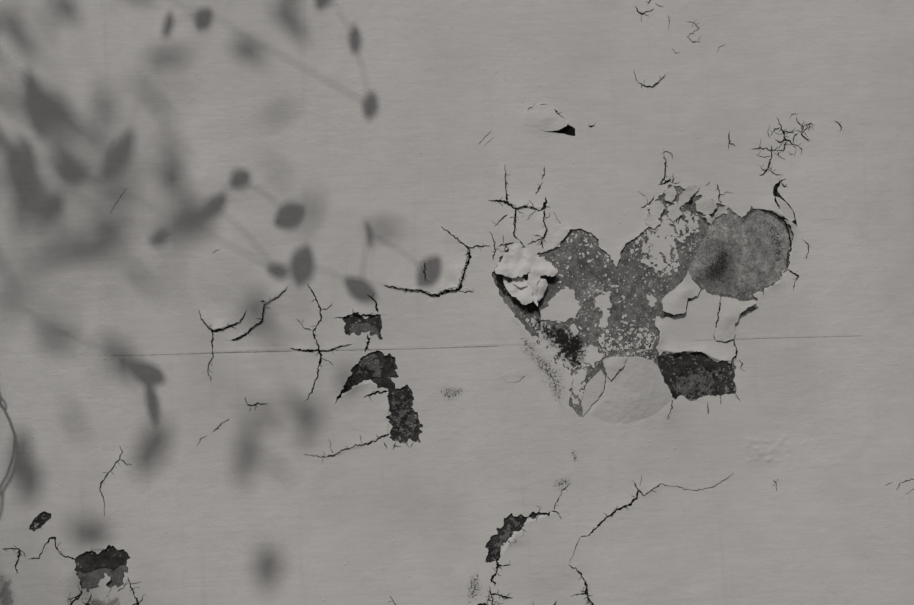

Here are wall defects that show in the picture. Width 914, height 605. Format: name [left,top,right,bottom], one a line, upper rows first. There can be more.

crack [728,113,842,176]
crack [385,167,560,297]
crack [114,285,385,400]
spalling [305,294,423,461]
peeling [492,179,797,424]
crack [3,548,27,574]
peeling [29,511,51,531]
spalling [30,537,145,605]
crack [477,593,503,605]
spalling [485,482,571,599]
crack [533,473,734,605]